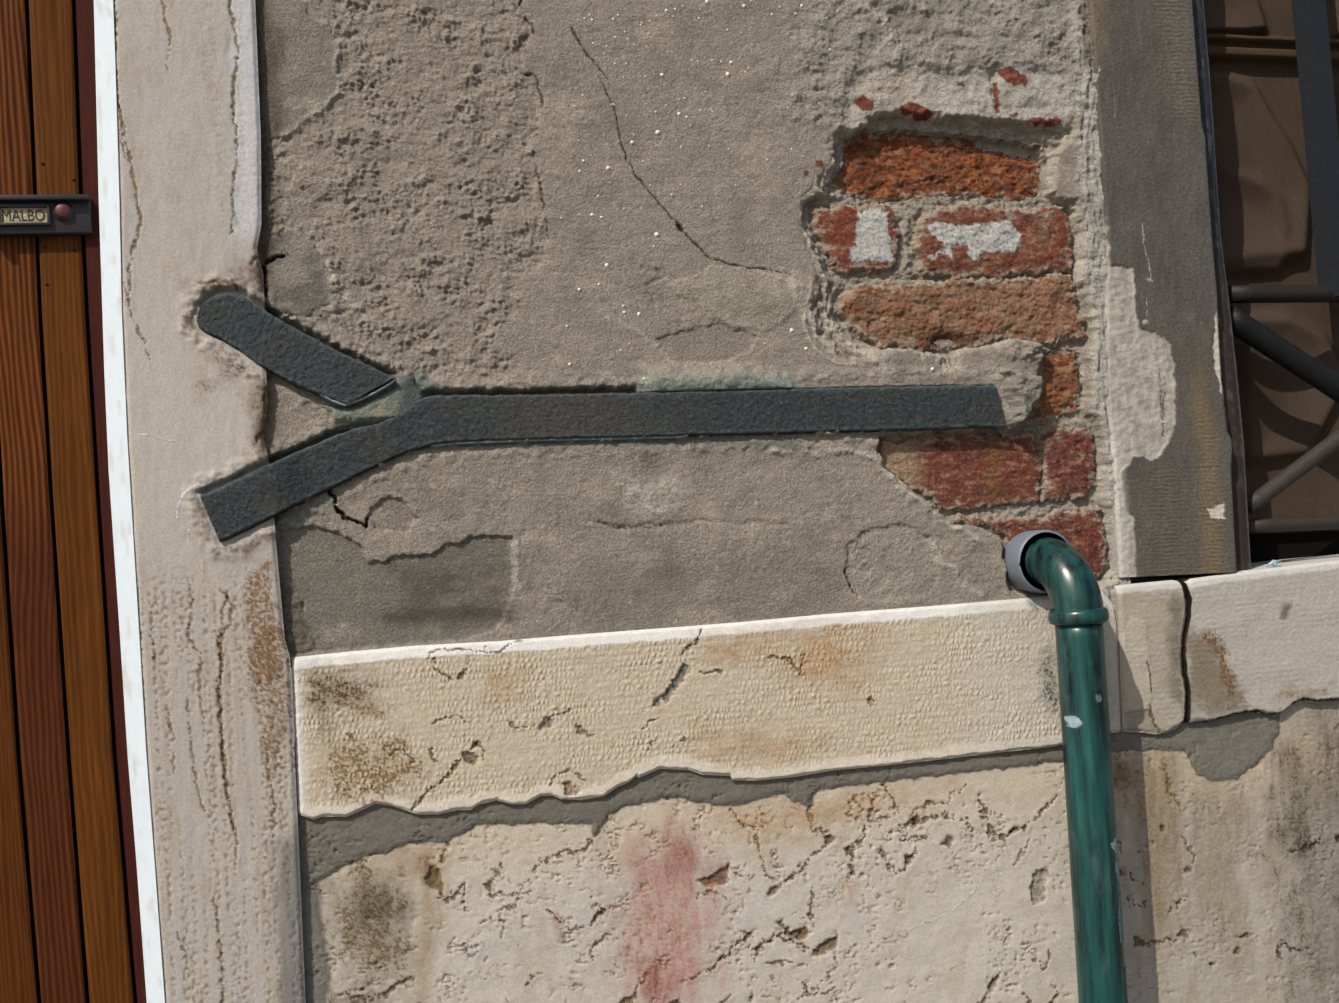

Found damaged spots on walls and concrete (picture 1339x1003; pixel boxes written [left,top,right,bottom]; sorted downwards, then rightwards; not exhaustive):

crack [113,0,150,356]
flaking render [255,0,550,382]
crack [571,3,786,273]
flaking render [797,63,1177,597]
crack [166,578,239,865]
leakage [248,628,289,767]
crack [177,900,224,1003]
crack [340,976,415,1003]
crack [425,835,612,958]
crack [621,972,650,1003]
crack [672,784,1059,1003]
crack [1117,764,1301,965]